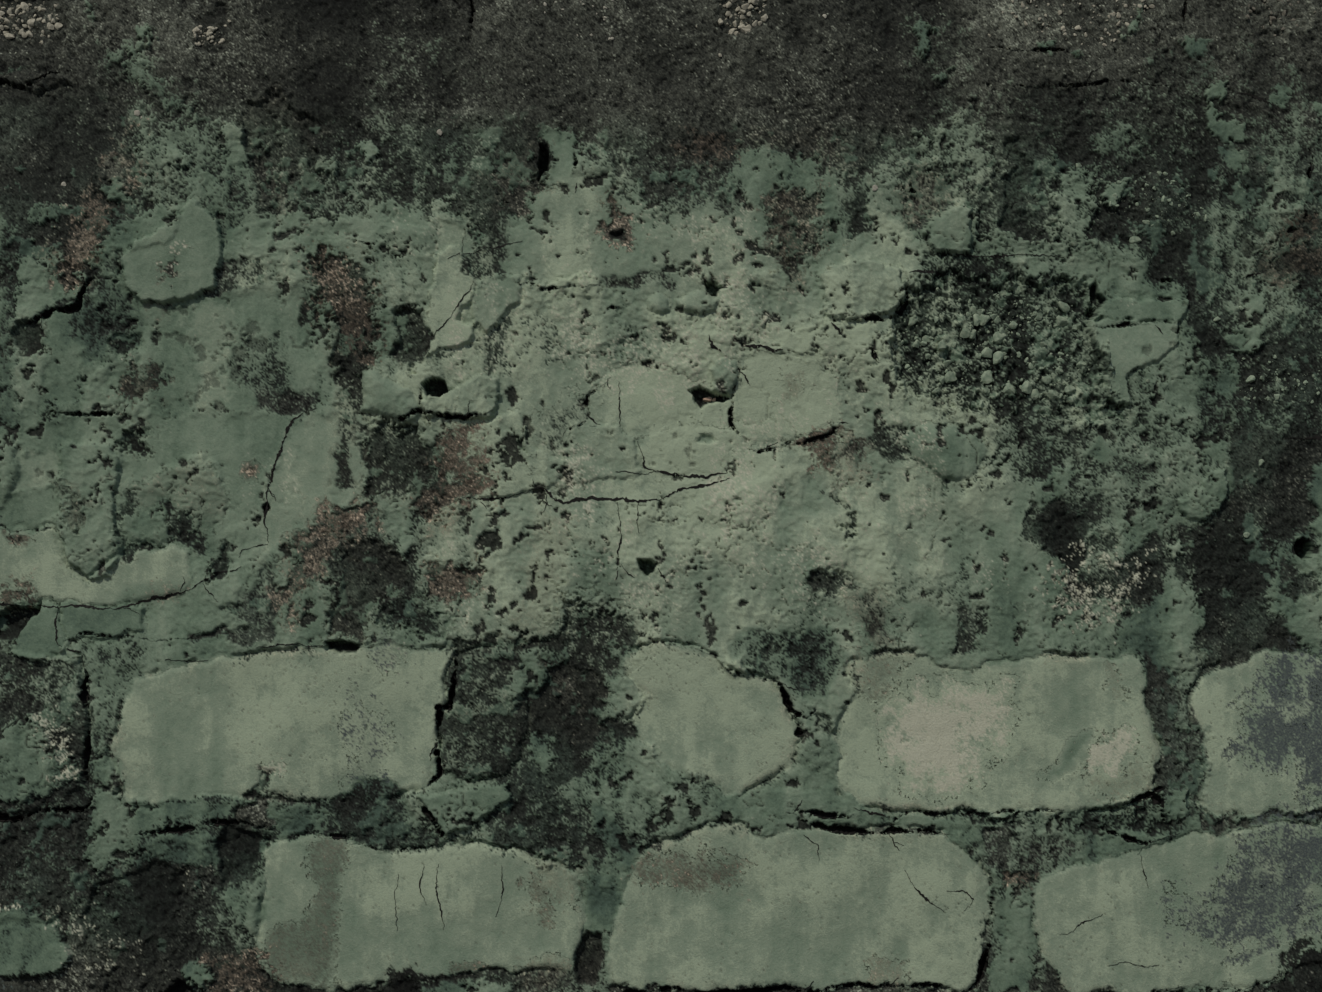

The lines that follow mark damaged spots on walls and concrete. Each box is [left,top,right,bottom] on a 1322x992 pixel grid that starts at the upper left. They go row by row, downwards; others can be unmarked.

flaking render [233,82,332,219]
peeling [119,195,226,307]
peeling [388,246,525,376]
crack [517,279,621,314]
spalling [820,205,1189,430]
crack [47,403,128,416]
peeling [51,423,234,586]
crack [458,377,729,583]
peeling [352,348,849,502]
crack [709,335,847,453]
crack [0,409,323,823]
crack [140,814,267,835]